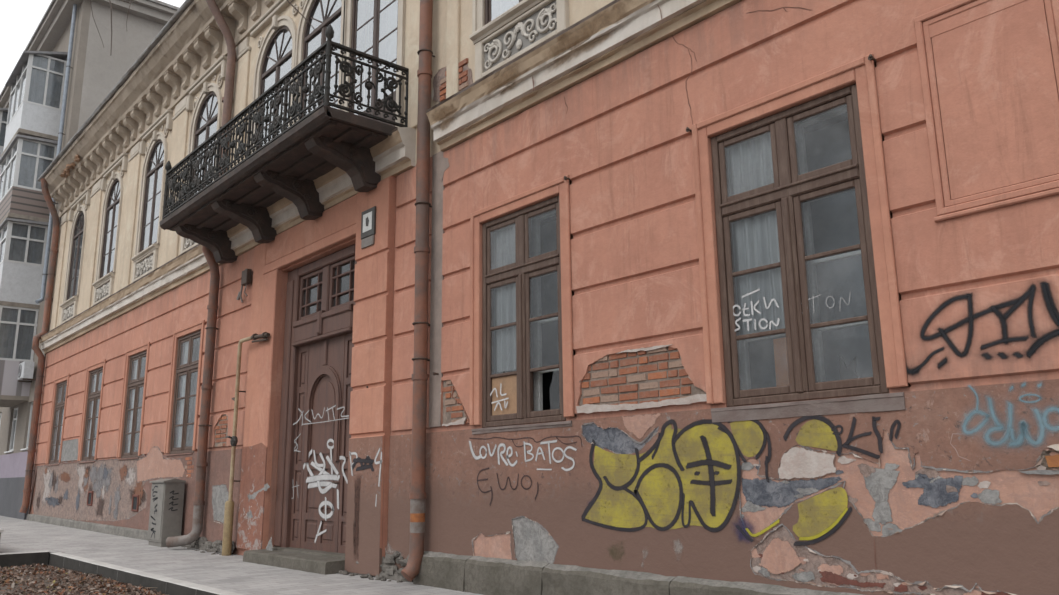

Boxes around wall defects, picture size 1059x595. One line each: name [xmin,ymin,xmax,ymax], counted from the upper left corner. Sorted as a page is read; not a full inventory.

crack [748,6,810,14]
flaking render [440,379,470,426]
flaking render [576,344,707,454]
peeling [32,439,194,521]
flaking render [472,516,559,564]
peeling [739,429,1059,595]